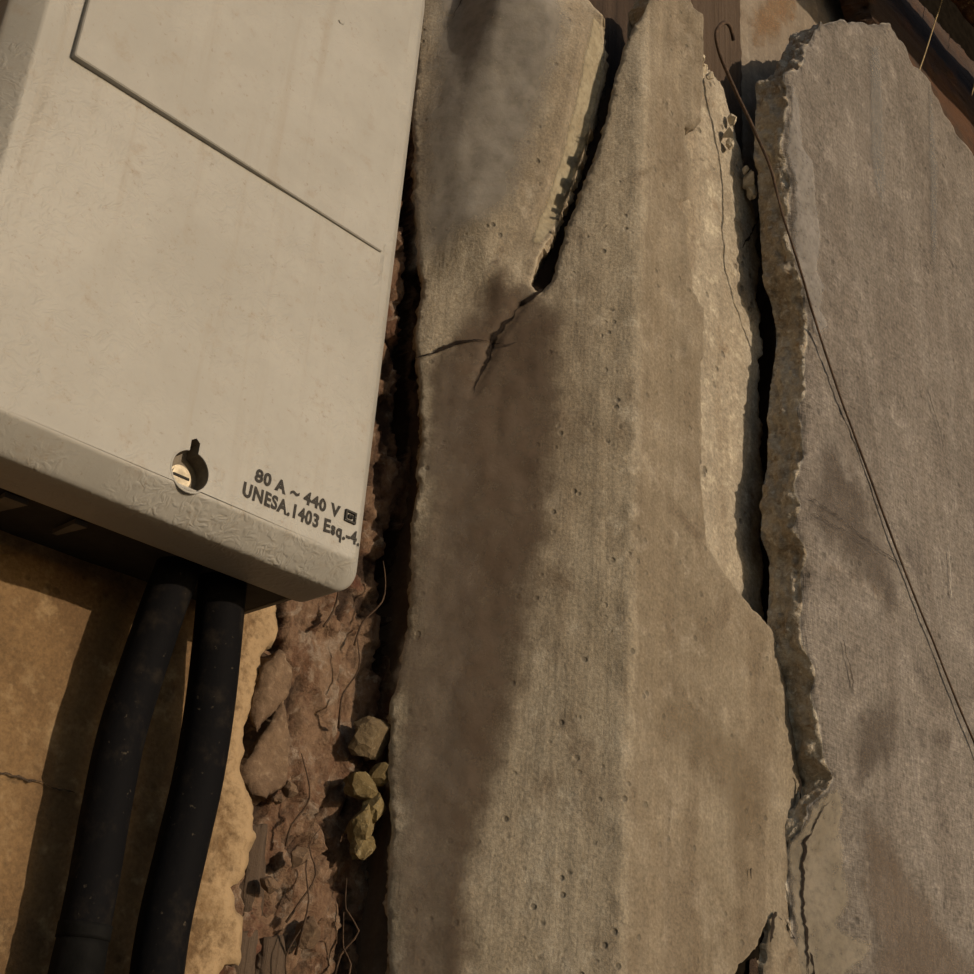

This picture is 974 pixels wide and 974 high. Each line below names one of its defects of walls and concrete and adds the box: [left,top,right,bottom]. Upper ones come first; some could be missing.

crack [416,88,612,392]
spalling [678,55,766,622]
peeling [787,87,827,333]
crack [770,798,832,974]